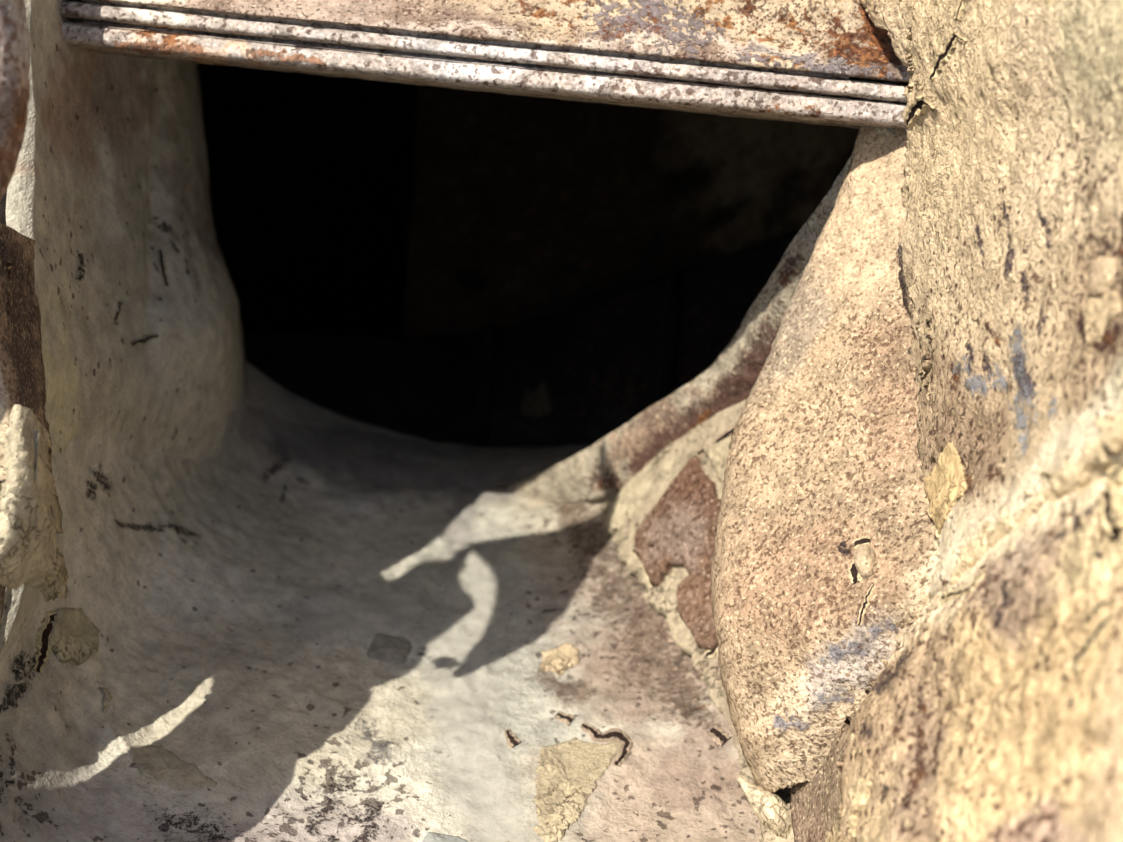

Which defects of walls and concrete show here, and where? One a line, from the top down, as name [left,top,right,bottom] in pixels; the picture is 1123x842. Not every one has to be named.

rust [115,39,204,57]
rust [506,0,679,41]
rust [802,1,908,72]
crack [904,0,967,127]
rust [0,88,29,196]
peeling [703,433,732,484]
peeling [924,443,968,534]
leakage [141,797,230,842]
leakage [301,707,394,842]
crack [504,728,521,749]
peeling [533,737,622,842]
crack [554,711,633,767]